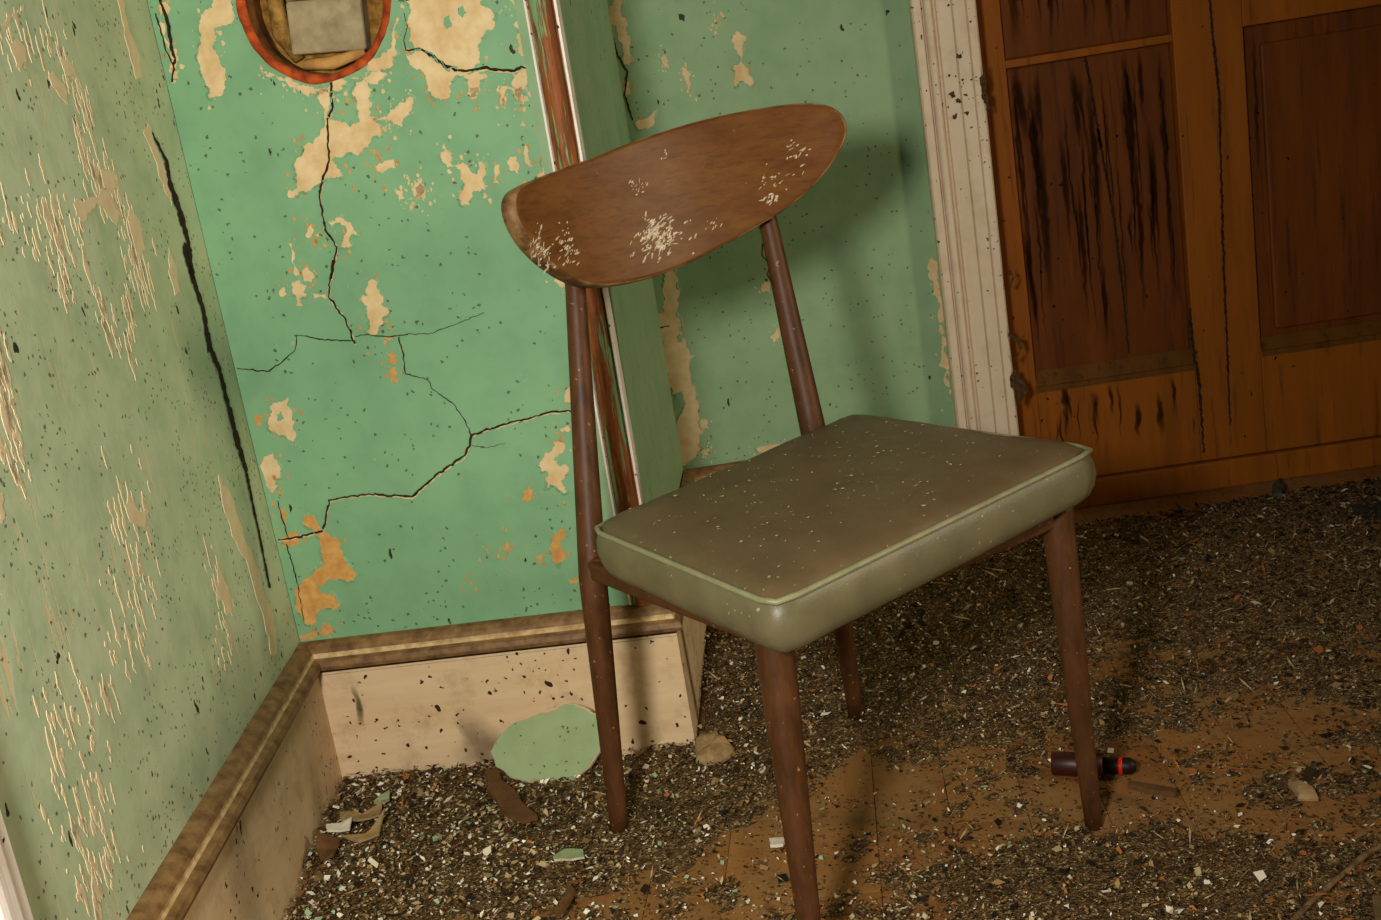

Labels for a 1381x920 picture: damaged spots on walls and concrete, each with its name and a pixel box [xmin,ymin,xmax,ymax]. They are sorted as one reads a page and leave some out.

crack [155,0,177,84]
peeling [258,0,544,306]
crack [398,0,526,74]
crack [612,31,633,120]
peeling [609,0,664,132]
peeling [708,2,758,109]
crack [152,82,571,621]
peeling [347,270,403,384]
peeling [658,269,715,468]
peeling [254,398,356,641]
peeling [461,387,580,596]
peeling [33,444,161,920]